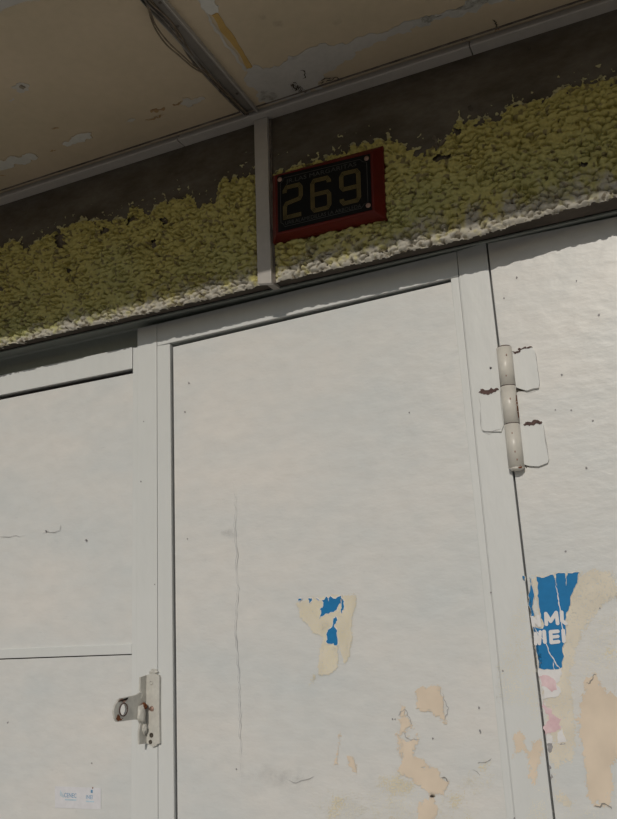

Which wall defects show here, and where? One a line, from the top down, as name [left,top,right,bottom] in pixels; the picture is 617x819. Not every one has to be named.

peeling [198,0,413,103]
peeling [375,684,465,819]
peeling [512,728,565,785]
peeling [572,672,617,809]